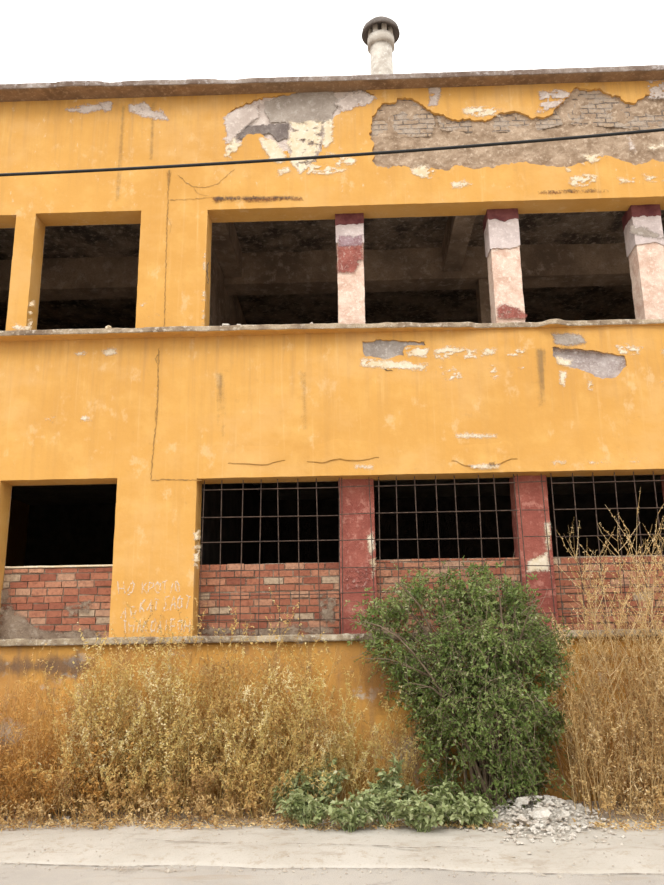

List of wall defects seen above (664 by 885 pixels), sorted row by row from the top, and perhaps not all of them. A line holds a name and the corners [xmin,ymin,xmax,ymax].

peeling [65,101,113,114]
peeling [128,102,168,121]
flaking render [223,80,664,192]
crack [164,169,235,325]
flaking render [361,340,496,370]
flaking render [552,333,639,390]
crack [150,349,202,481]